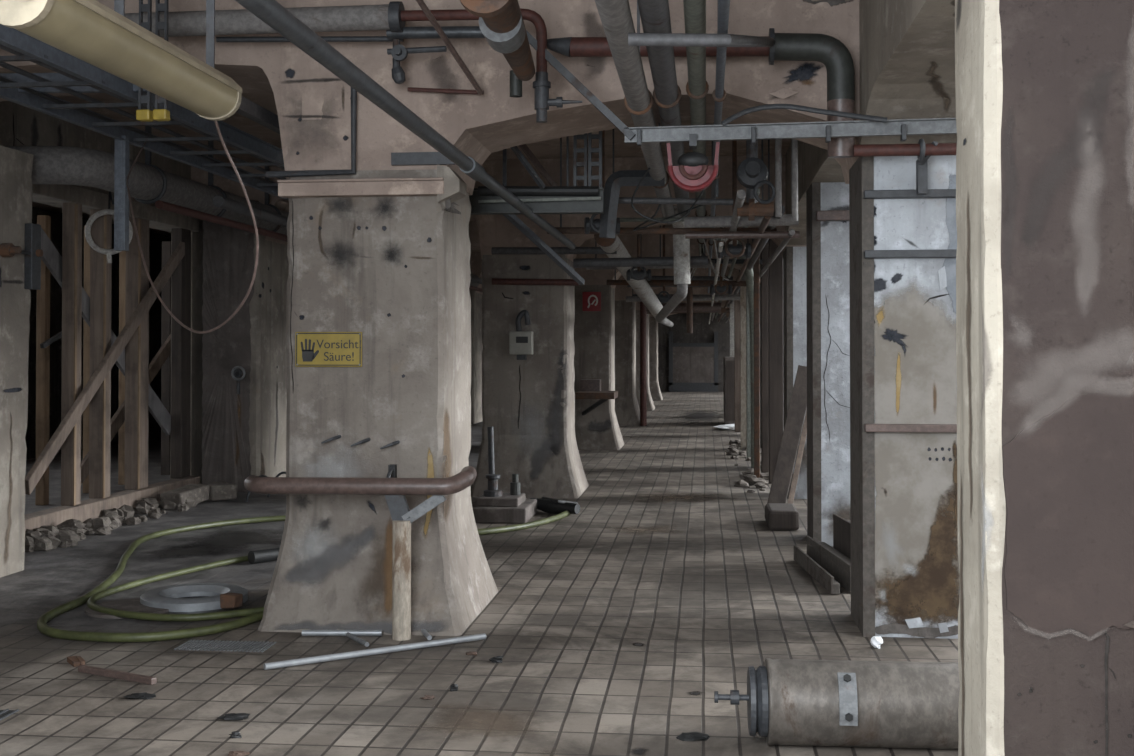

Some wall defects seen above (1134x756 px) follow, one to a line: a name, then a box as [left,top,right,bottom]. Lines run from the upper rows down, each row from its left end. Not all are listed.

peeling [1002,389,1134,639]